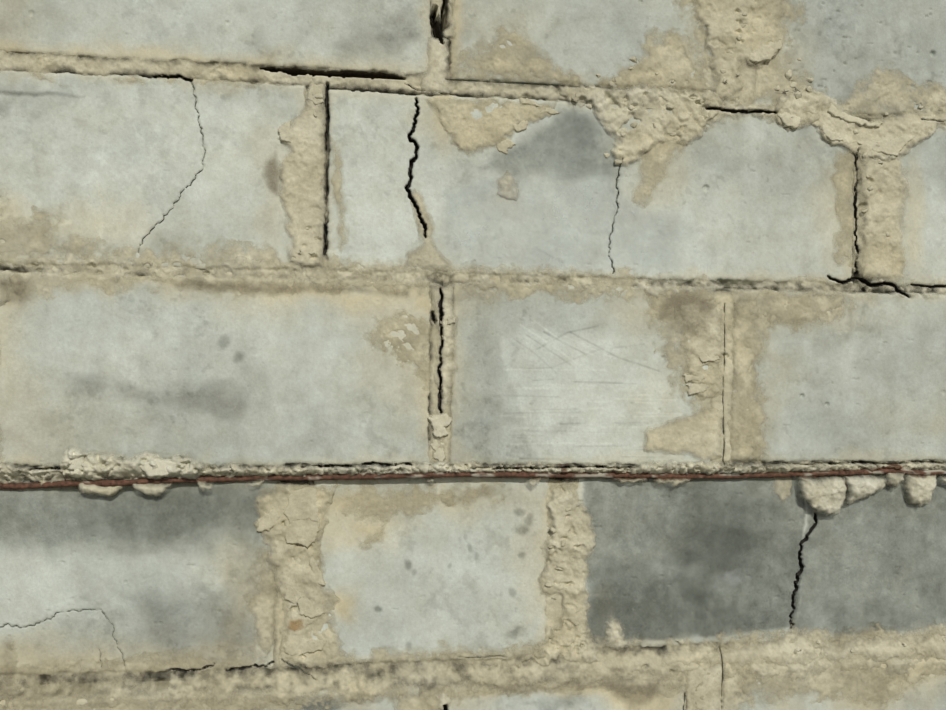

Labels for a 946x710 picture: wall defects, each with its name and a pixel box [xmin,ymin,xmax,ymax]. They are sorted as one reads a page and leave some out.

peeling [278,83,326,265]
crack [322,85,330,255]
crack [405,99,427,238]
crack [608,157,623,274]
peeling [560,0,946,280]
crack [827,149,946,297]
crack [431,289,444,412]
peeling [675,300,723,399]
peeling [255,468,356,667]
peeling [518,462,857,667]
crack [789,513,818,629]
peeling [665,628,946,667]